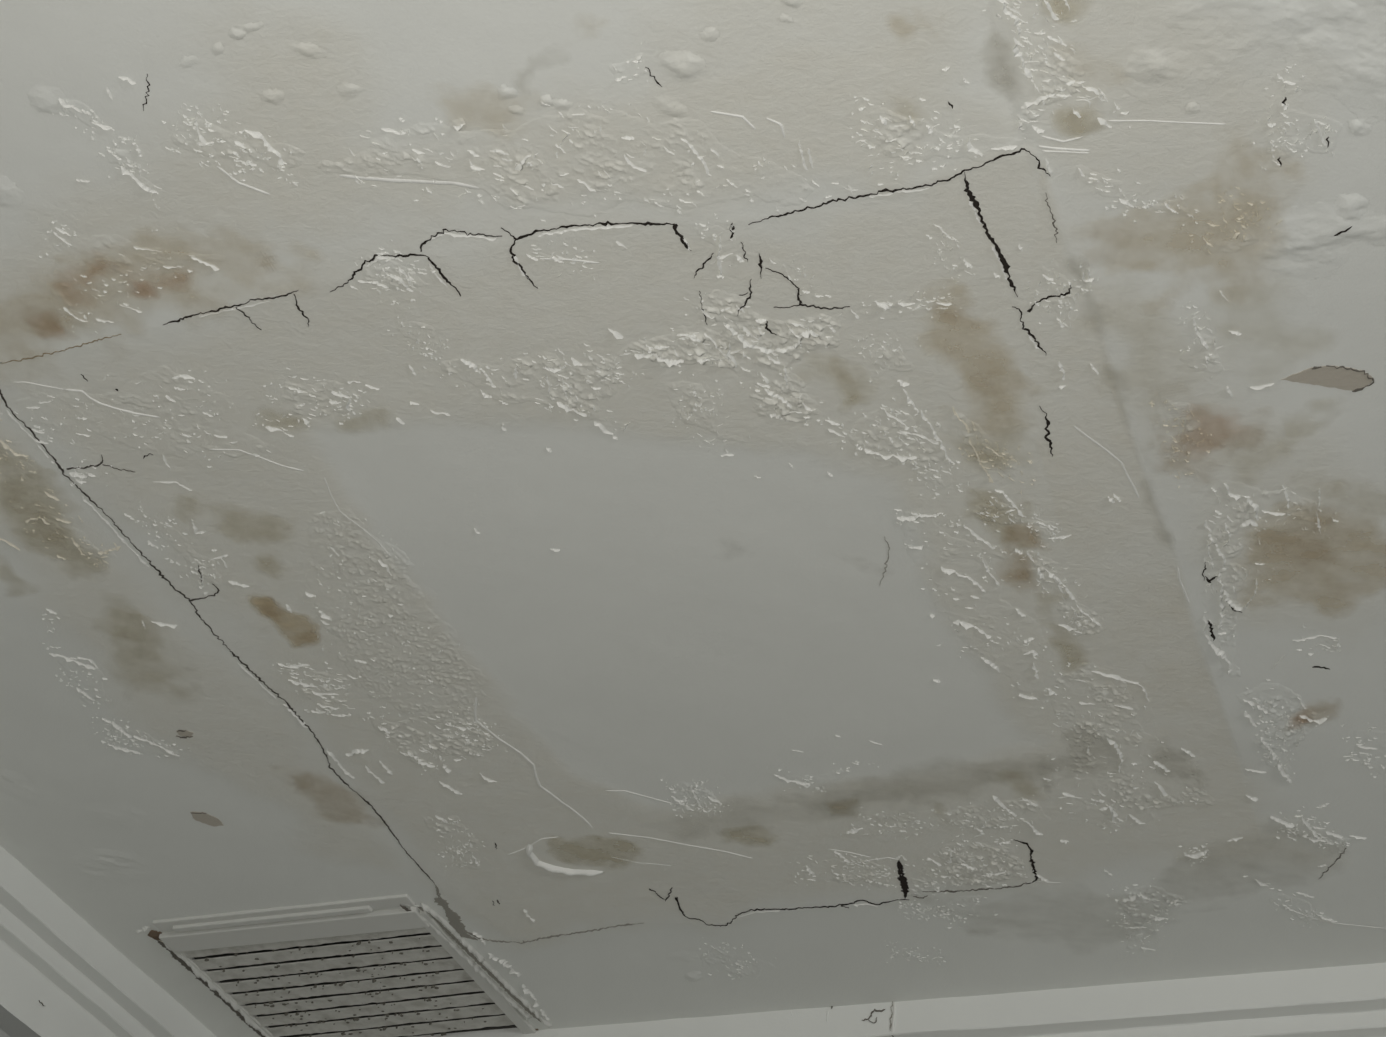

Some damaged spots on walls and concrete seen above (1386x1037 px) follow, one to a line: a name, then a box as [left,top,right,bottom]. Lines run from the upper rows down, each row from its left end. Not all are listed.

peeling [850,0,1200,226]
peeling [37,219,226,334]
crack [163,148,1071,353]
peeling [409,213,975,499]
crack [1040,407,1053,456]
peeling [1027,259,1099,328]
flaking render [1250,365,1374,392]
leakage [251,598,317,645]
crack [0,334,1049,944]
peeling [943,489,1104,637]
peeling [1202,479,1341,783]
peeling [272,660,508,795]